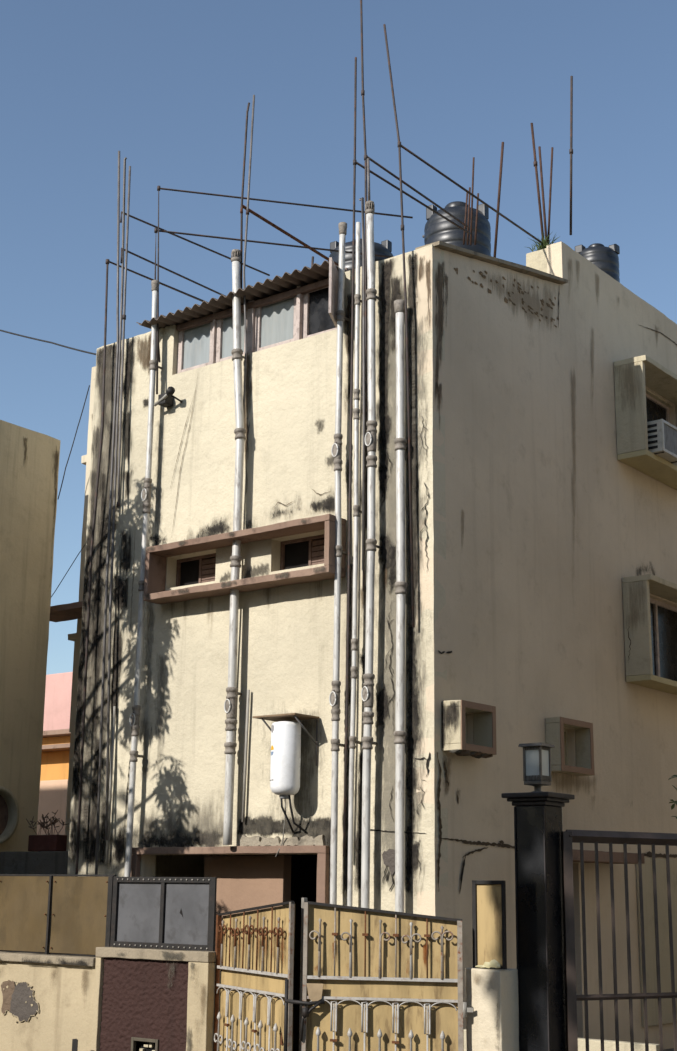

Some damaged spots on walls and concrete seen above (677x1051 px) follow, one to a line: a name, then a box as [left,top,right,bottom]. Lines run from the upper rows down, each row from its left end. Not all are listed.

peeling [454,268,558,327]
leakage [145,426,234,551]
leakage [70,334,151,864]
leakage [237,254,448,892]
leakage [143,658,164,775]
crack [384,600,395,735]
leakage [140,816,223,847]
crack [370,752,515,891]
crack [643,850,677,858]
peeling [1,980,40,1022]